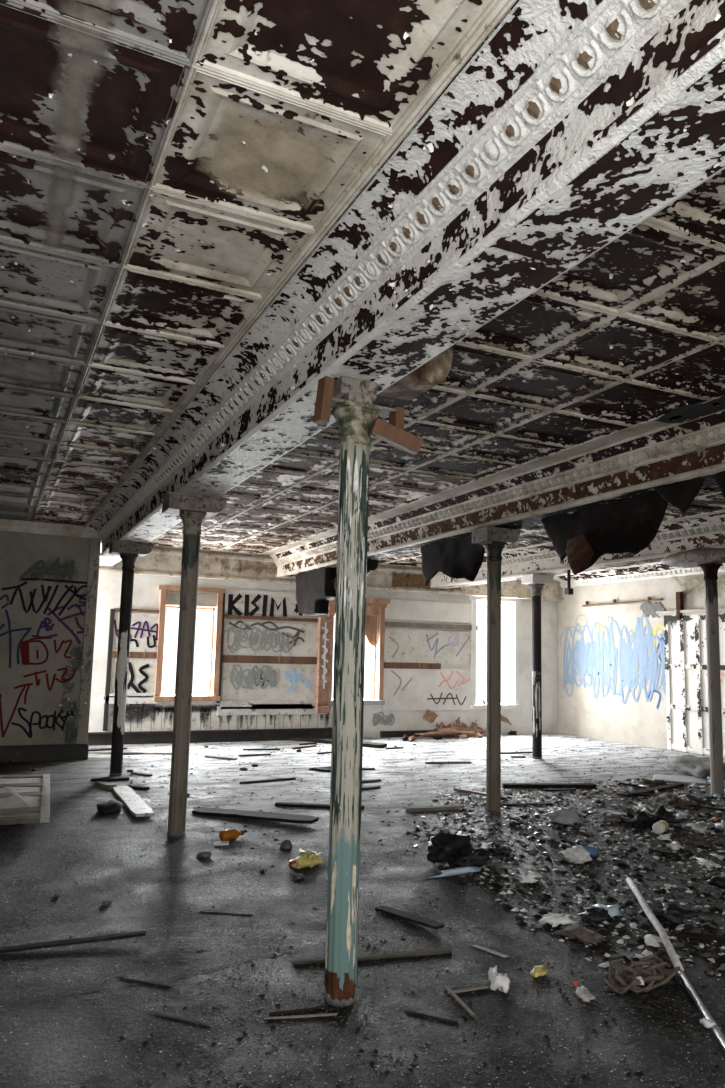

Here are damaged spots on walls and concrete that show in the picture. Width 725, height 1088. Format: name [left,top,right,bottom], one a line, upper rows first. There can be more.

leakage [204,116,327,203]
peeling [96,928,452,1088]
peeling [358,850,724,1088]